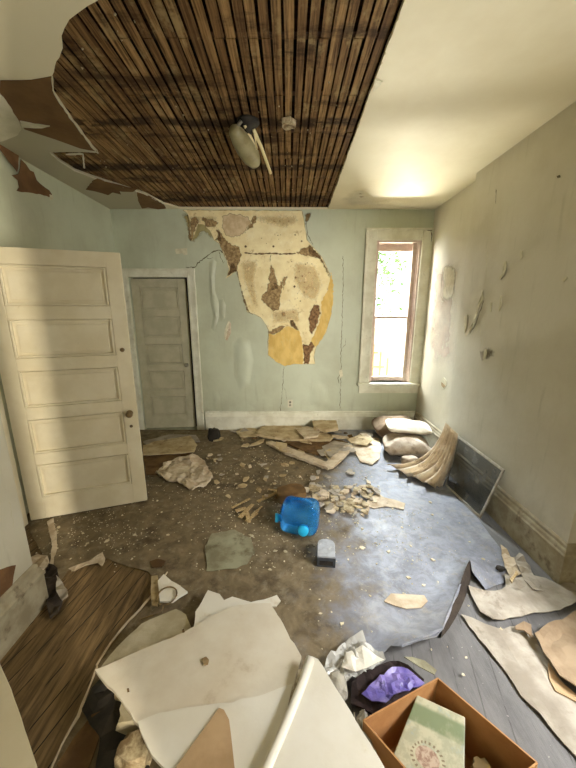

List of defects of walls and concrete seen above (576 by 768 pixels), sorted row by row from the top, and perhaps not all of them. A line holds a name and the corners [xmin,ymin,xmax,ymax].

flaking render [50,0,404,366]
crack [186,250,223,268]
crack [338,258,346,408]